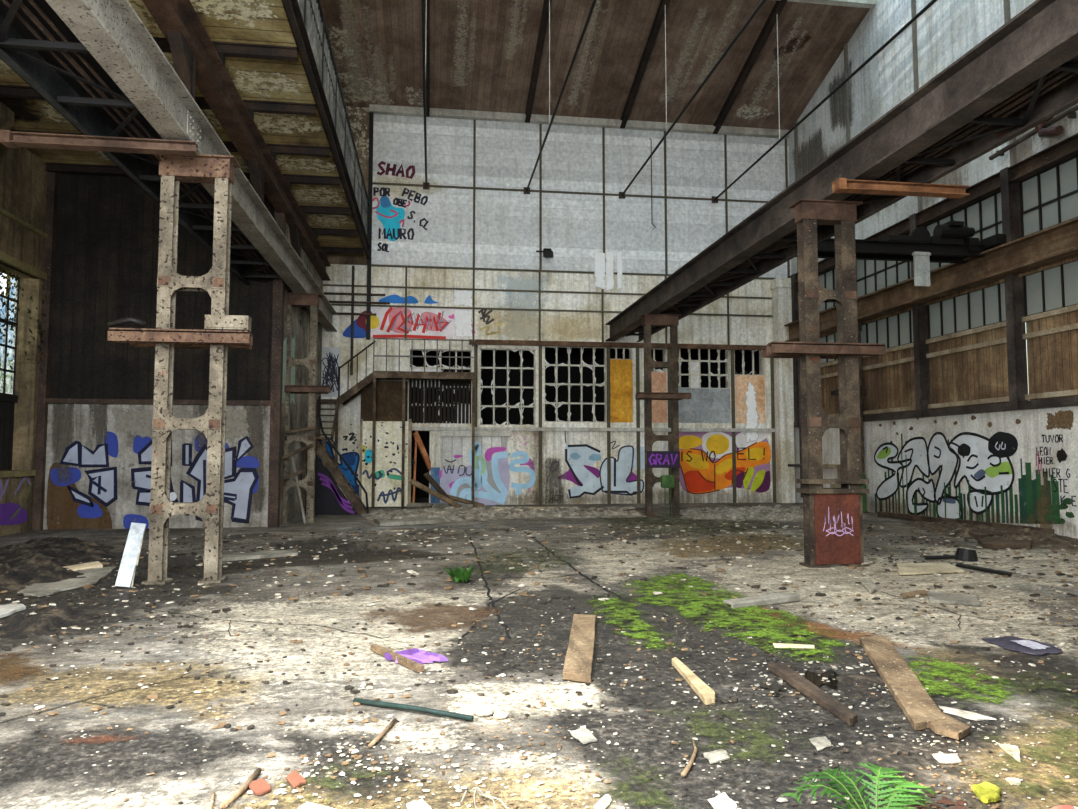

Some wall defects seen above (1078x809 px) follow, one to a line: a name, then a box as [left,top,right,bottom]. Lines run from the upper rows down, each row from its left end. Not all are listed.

crack [457,532,621,644]